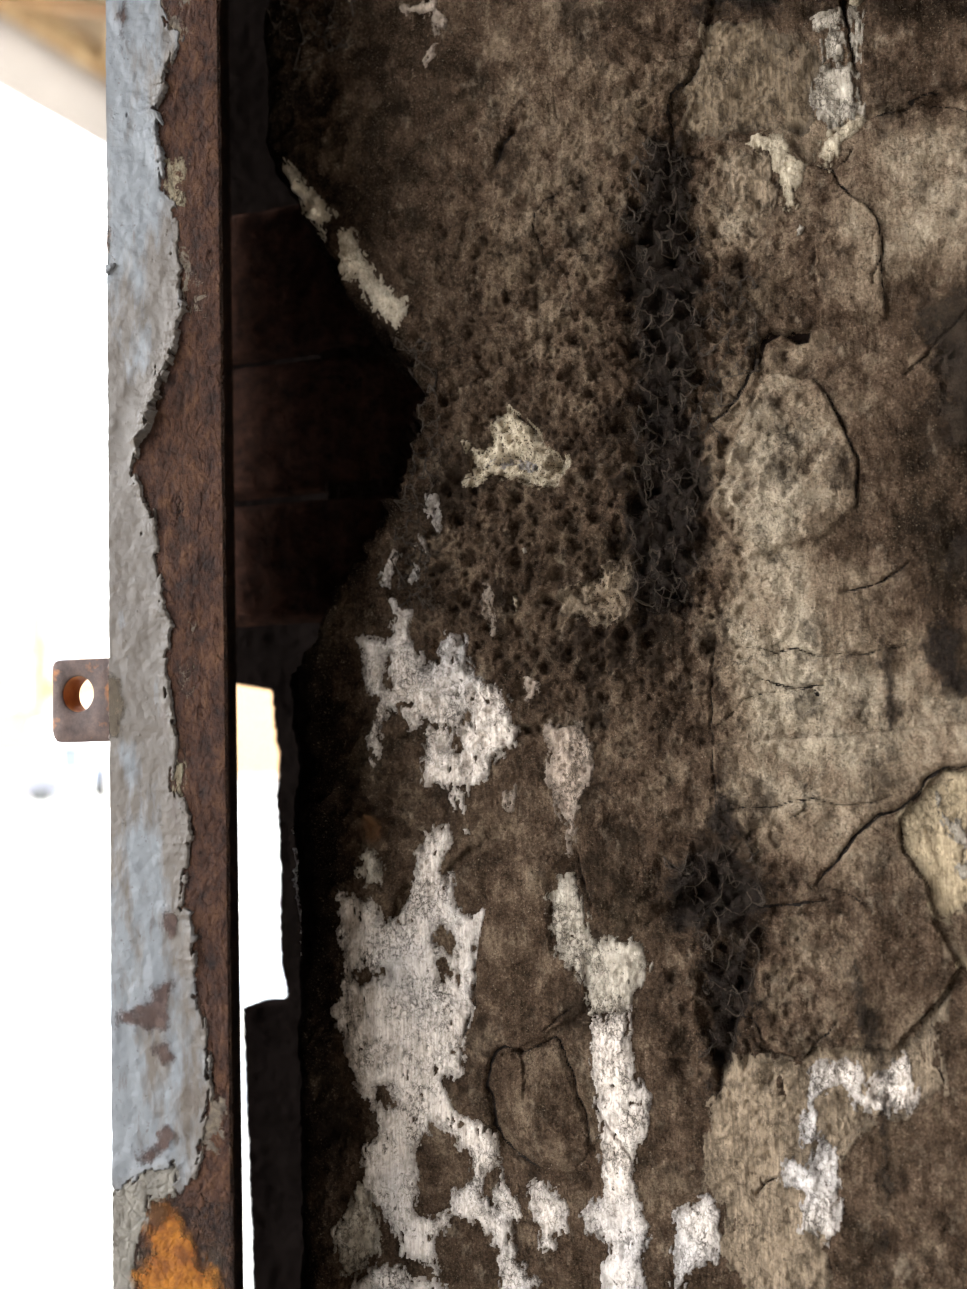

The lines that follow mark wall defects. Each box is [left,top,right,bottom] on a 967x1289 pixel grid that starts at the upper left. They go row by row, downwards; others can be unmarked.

crack [666,50,701,137]
spalling [681,0,867,236]
spalling [231,157,428,632]
spalling [460,404,573,490]
crack [712,343,757,422]
crack [815,381,860,498]
crack [847,562,909,591]
corrosion [162,911,178,938]
peeling [330,493,654,1289]
crack [485,1008,594,1168]
spalling [668,986,951,1289]
corrosion [132,1202,217,1289]